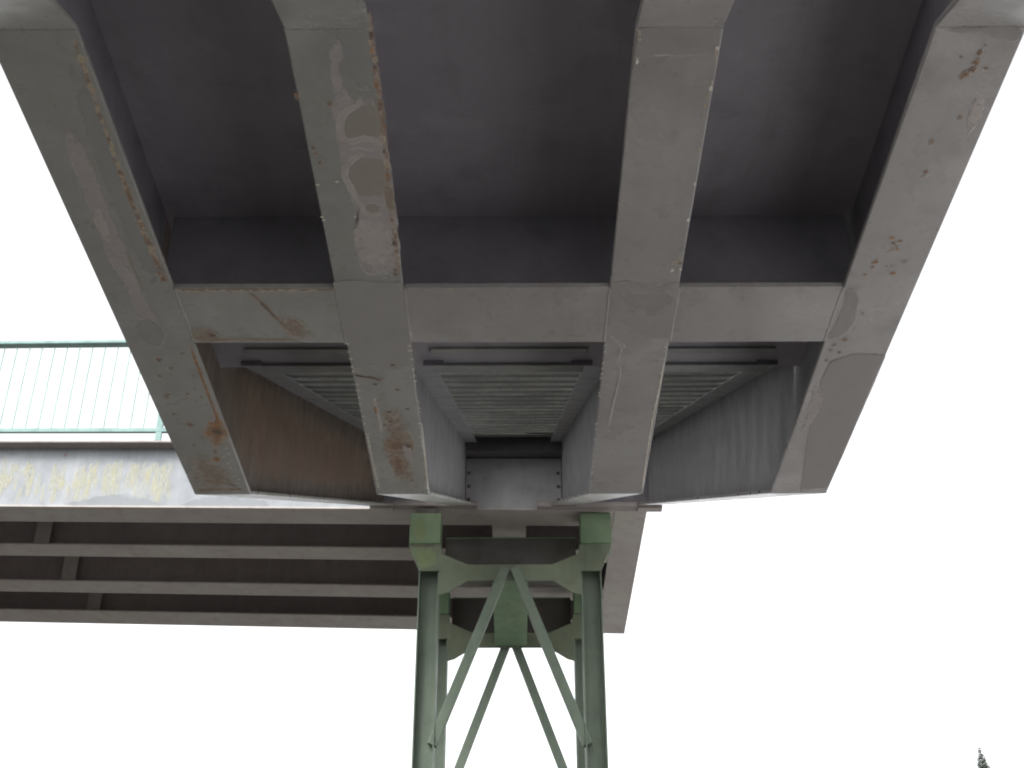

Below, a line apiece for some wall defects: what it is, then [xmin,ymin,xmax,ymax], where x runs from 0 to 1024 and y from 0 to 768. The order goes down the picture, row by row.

peeling [329,40,401,275]
rust [367,10,401,277]
water stain [0,462,172,506]
rust [171,291,309,492]
rust [373,399,417,487]